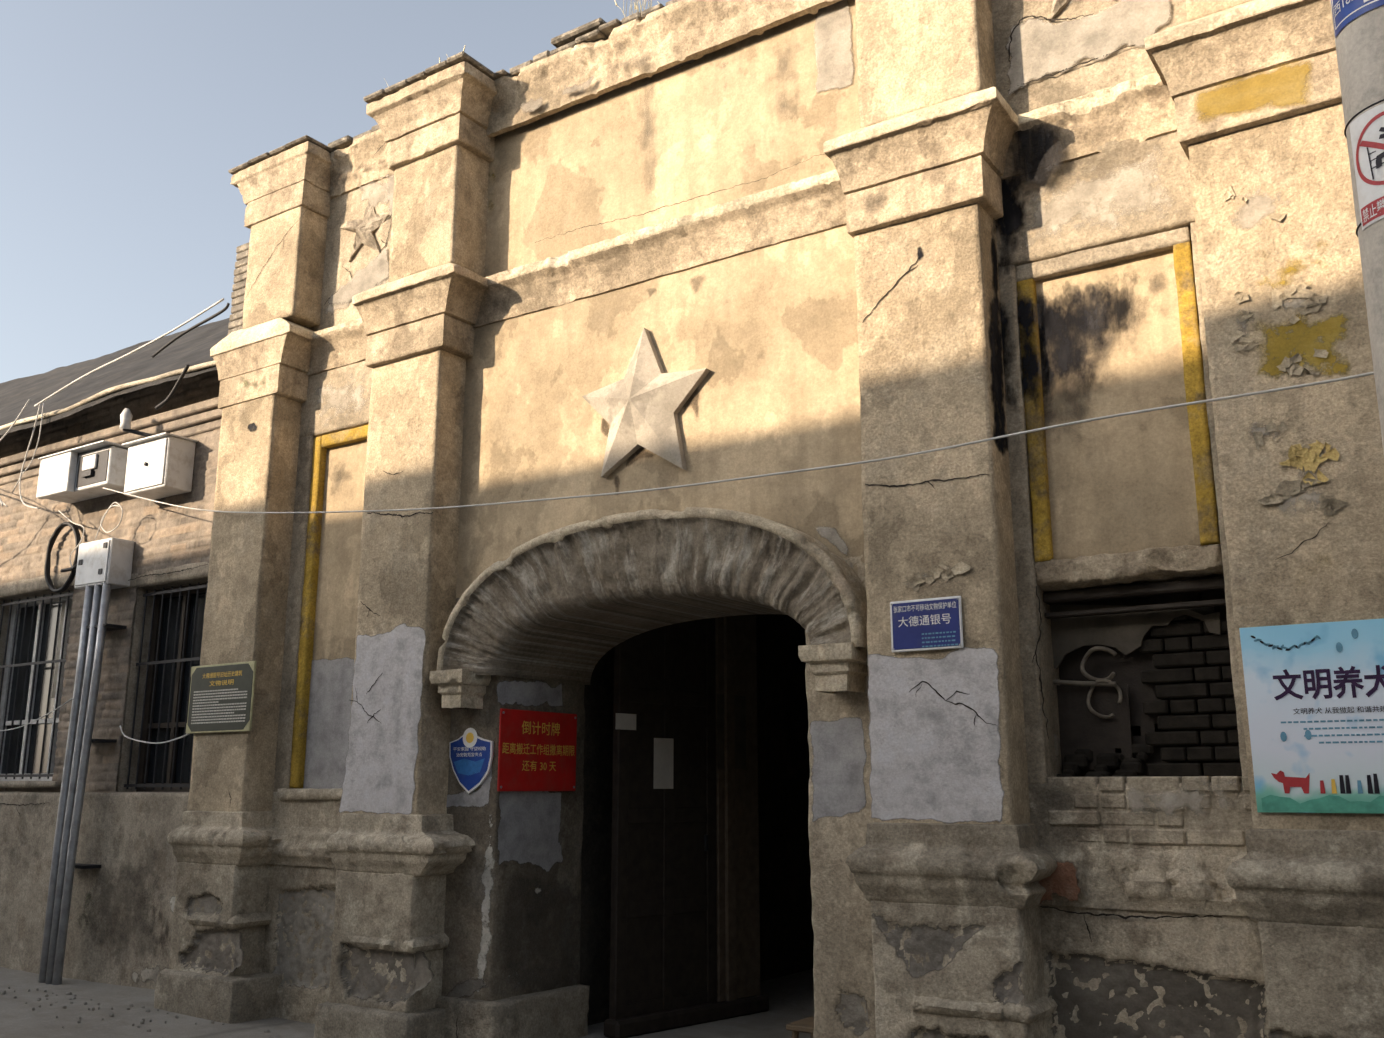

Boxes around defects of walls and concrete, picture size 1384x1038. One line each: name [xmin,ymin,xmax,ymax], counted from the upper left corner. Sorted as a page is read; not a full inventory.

crack [1008,13,1134,91]
leakage [995,124,1067,268]
crack [862,259,918,323]
leakage [1000,296,1042,406]
leakage [1114,292,1127,329]
peeling [1224,291,1262,352]
peeling [1272,283,1327,324]
peeling [1276,348,1329,376]
flaking render [872,914,984,978]
flaking render [993,962,1024,1005]
flaking render [1046,952,1312,1038]
flaking render [911,1028,989,1038]